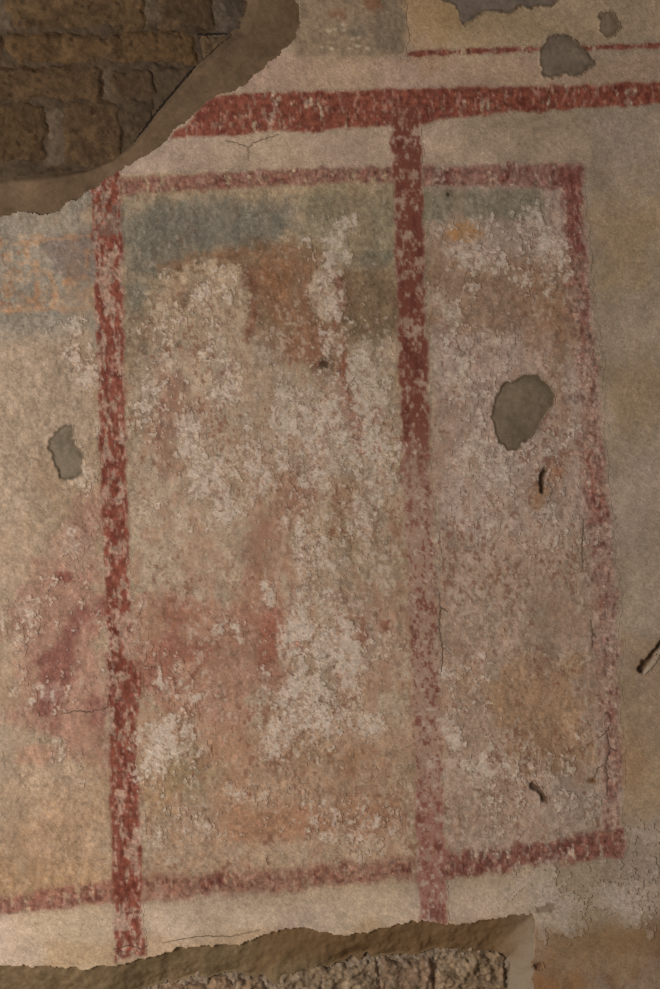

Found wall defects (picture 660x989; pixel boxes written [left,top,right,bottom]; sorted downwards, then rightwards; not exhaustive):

flaking render [0,0,300,217]
peeling [42,308,106,399]
peeling [427,198,599,573]
peeling [59,209,423,864]
flaking render [0,899,559,989]